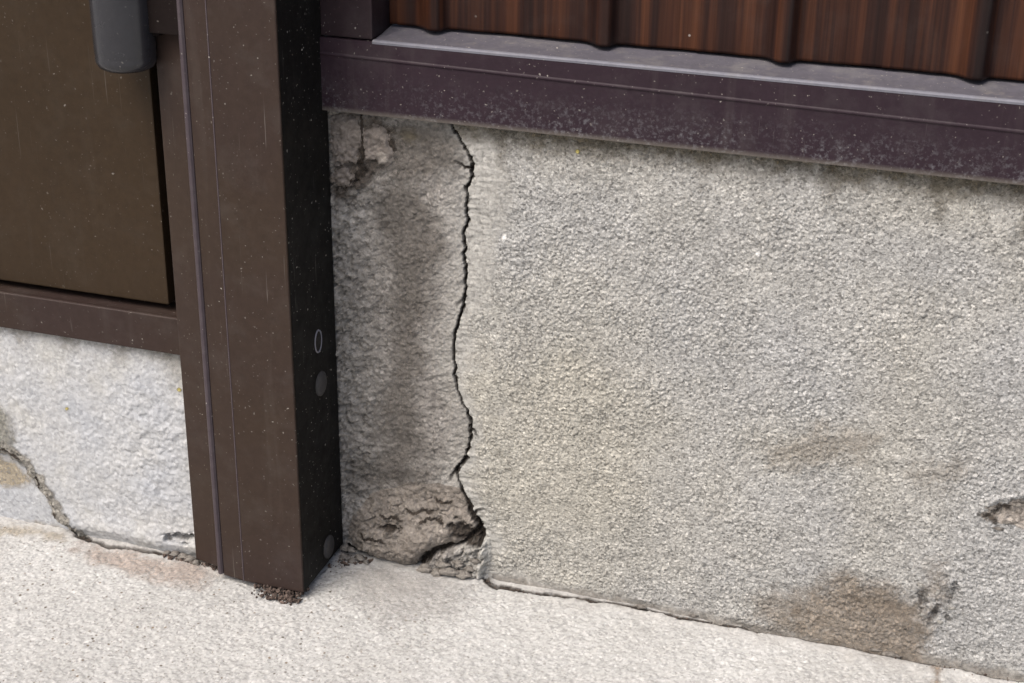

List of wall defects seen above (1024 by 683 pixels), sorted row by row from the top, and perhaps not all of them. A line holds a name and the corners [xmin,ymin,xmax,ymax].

peeling [330,113,396,198]
damp [382,192,438,483]
crack [416,124,780,636]
crack [75,535,163,556]
crack [339,543,369,565]
spalling [981,499,1024,531]
damp [793,577,928,660]
crack [805,638,931,665]